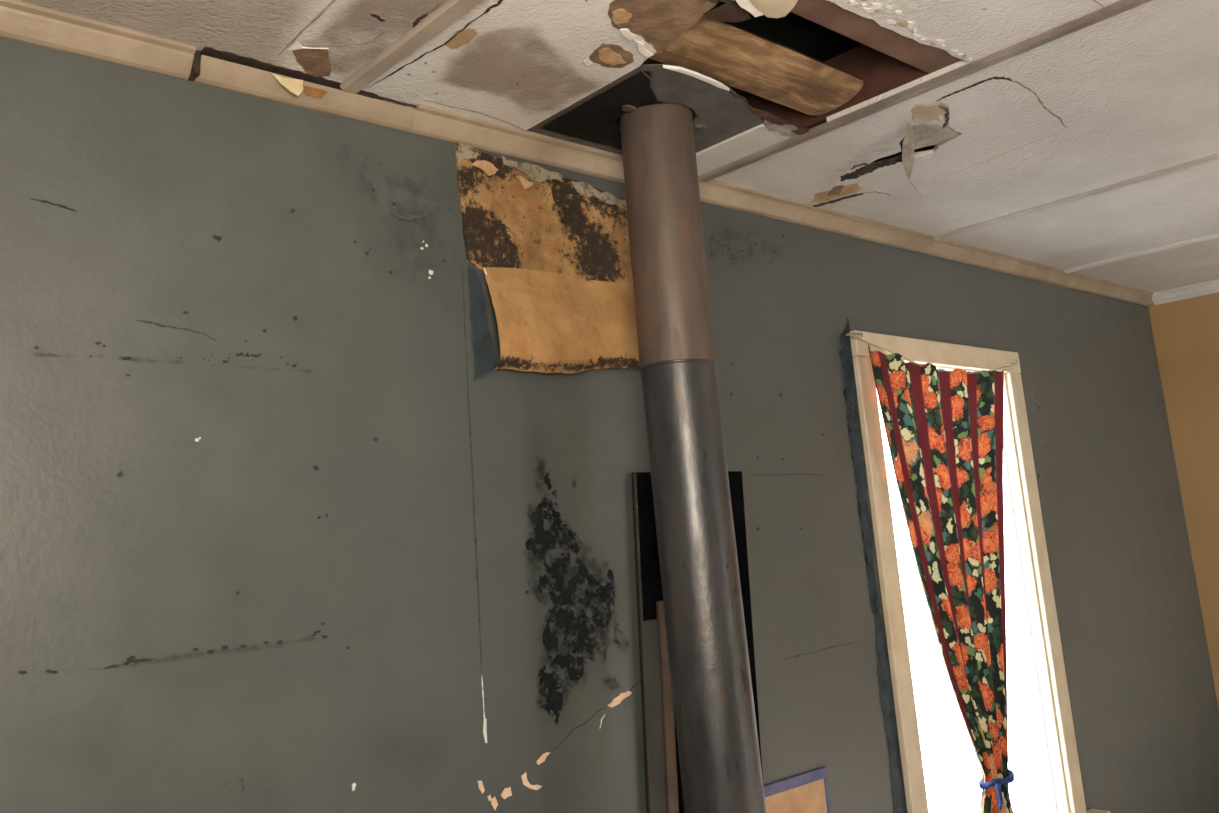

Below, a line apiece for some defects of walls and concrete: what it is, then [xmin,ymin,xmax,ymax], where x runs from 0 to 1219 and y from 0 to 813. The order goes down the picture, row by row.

peeling [620,28,653,57]
peeling [850,0,972,60]
leakage [525,462,628,724]
peeling [478,680,641,810]